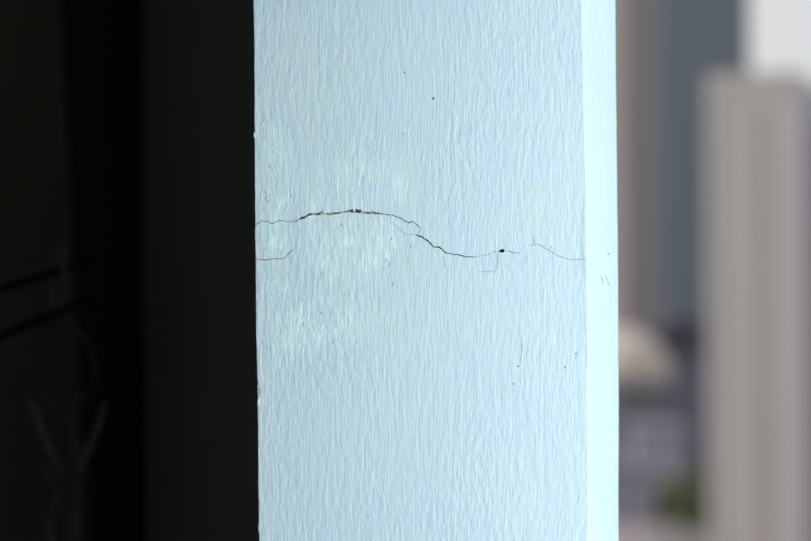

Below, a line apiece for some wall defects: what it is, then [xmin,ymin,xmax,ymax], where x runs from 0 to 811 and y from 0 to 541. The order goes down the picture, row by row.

crack [229,209,585,272]